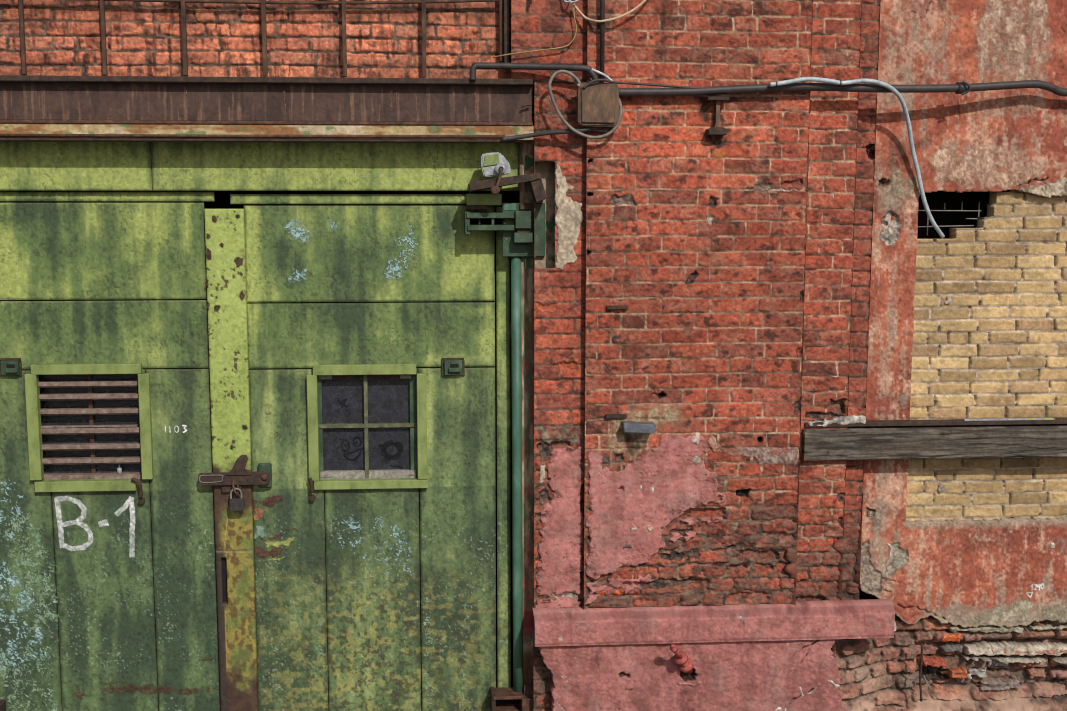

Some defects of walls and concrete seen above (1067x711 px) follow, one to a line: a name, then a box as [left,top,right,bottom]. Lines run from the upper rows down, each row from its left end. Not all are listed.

spalling [555,164,593,270]
peeling [535,432,749,608]
spalling [861,508,920,596]
spalling [918,600,1067,691]